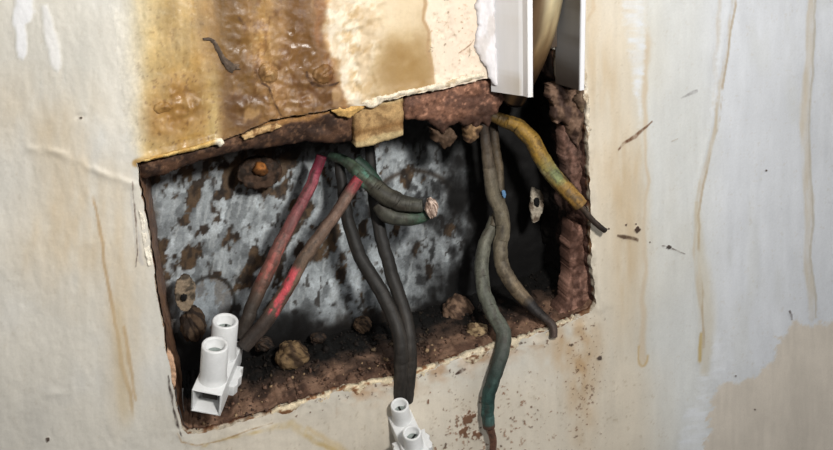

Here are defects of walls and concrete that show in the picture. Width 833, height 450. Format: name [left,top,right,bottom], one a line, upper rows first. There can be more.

rust [108,0,355,161]
water stain [691,0,738,372]
water stain [798,0,818,322]
rust [336,381,394,419]
rust [413,349,495,401]
rust [506,305,610,450]